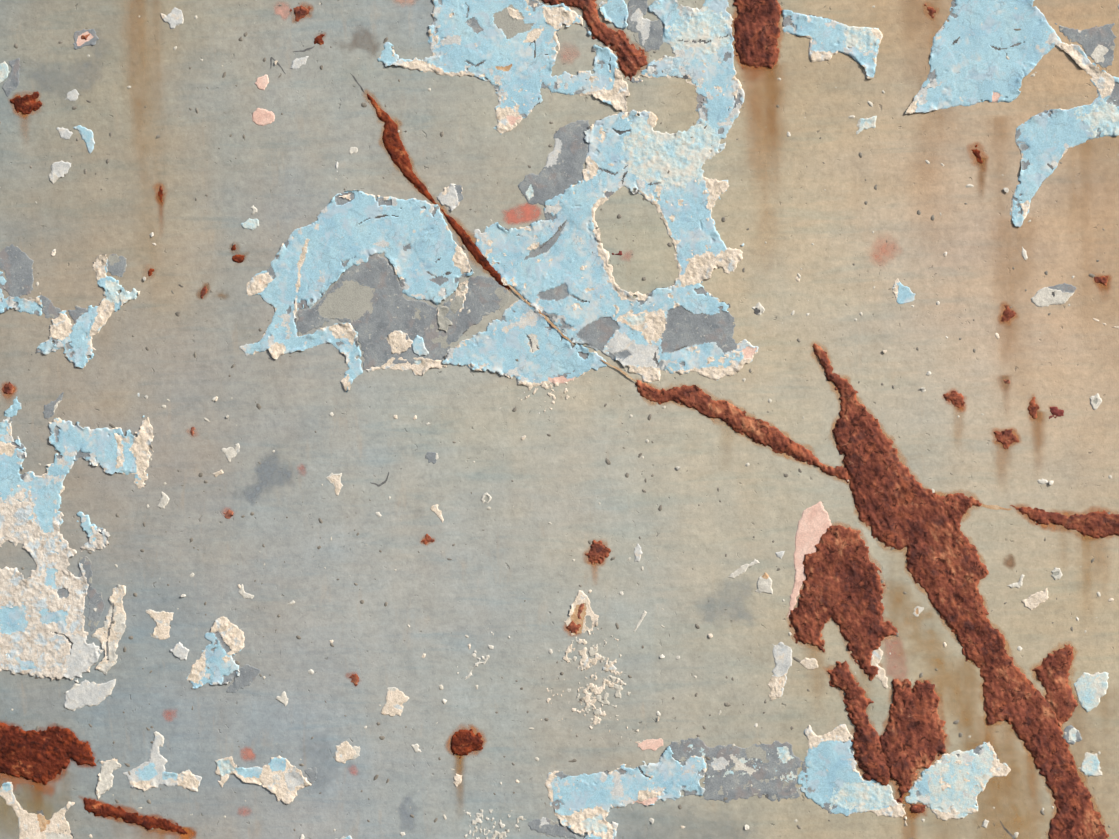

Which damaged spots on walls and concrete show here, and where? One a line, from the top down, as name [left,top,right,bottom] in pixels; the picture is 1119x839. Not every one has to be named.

rust [541,0,648,81]
rust [733,0,782,78]
peeling [905,0,1119,227]
crack [350,73,573,344]
peeling [239,0,759,392]
peeling [0,254,140,369]
rust [994,429,1019,449]
peeling [0,396,154,711]
rust [789,523,947,816]
rust [447,726,485,774]
peeling [545,746,707,839]
peeling [797,724,1011,828]